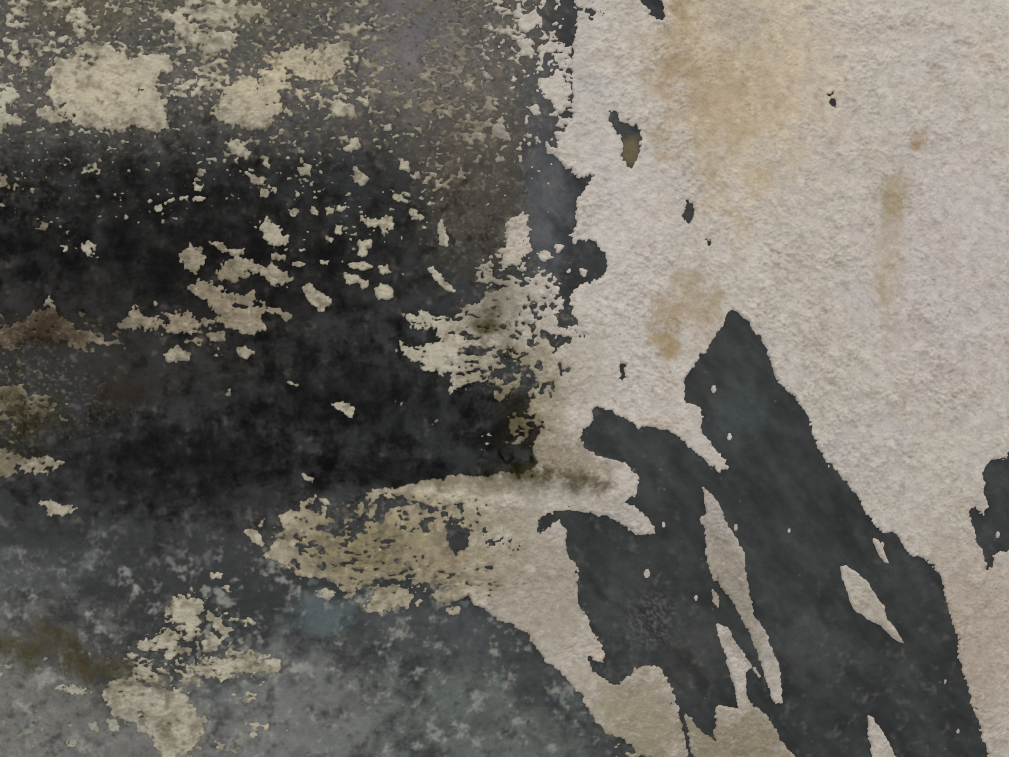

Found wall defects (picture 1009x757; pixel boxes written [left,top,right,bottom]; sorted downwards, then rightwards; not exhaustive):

peeling [641,0,665,20]
leakage [59,158,366,321]
leakage [477,319,495,332]
leakage [89,429,287,521]
peeling [0,0,645,757]
leakage [243,355,439,446]
leakage [345,462,449,489]
leakage [450,380,477,424]
leakage [474,414,531,451]
leakage [511,465,551,480]
spalling [537,310,989,757]
spalling [969,452,1009,570]